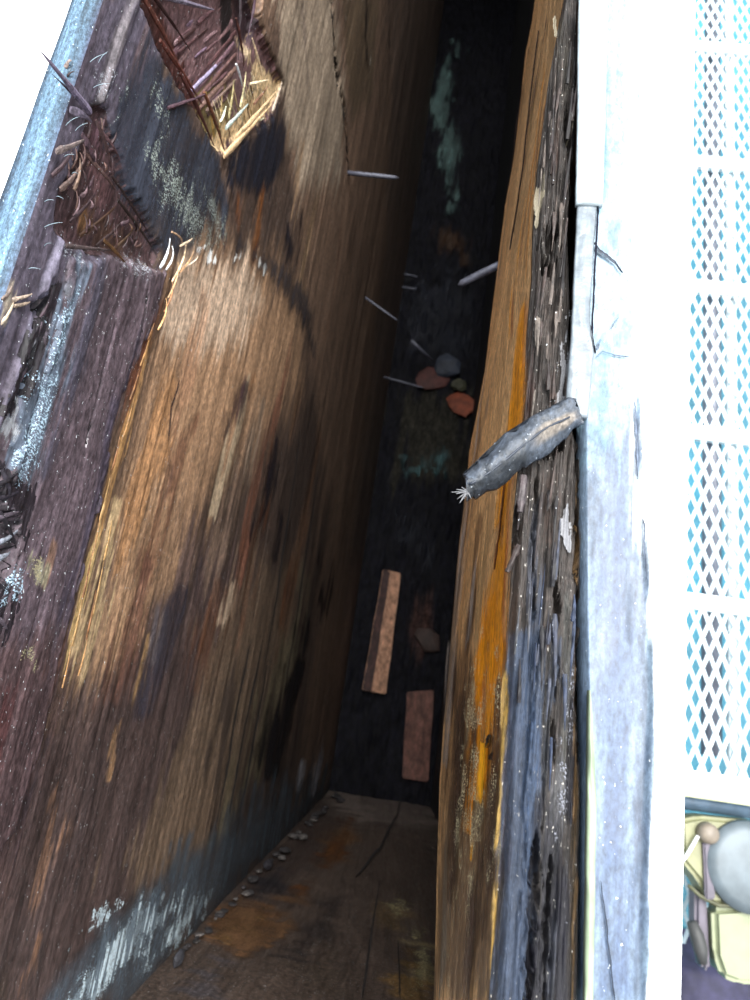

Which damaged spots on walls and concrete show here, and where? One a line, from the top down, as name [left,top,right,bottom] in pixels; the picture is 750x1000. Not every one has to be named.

damp [103,33,286,264]
crack [330,0,350,178]
damp [430,58,455,172]
damp [48,758,329,1000]
crack [356,801,401,999]